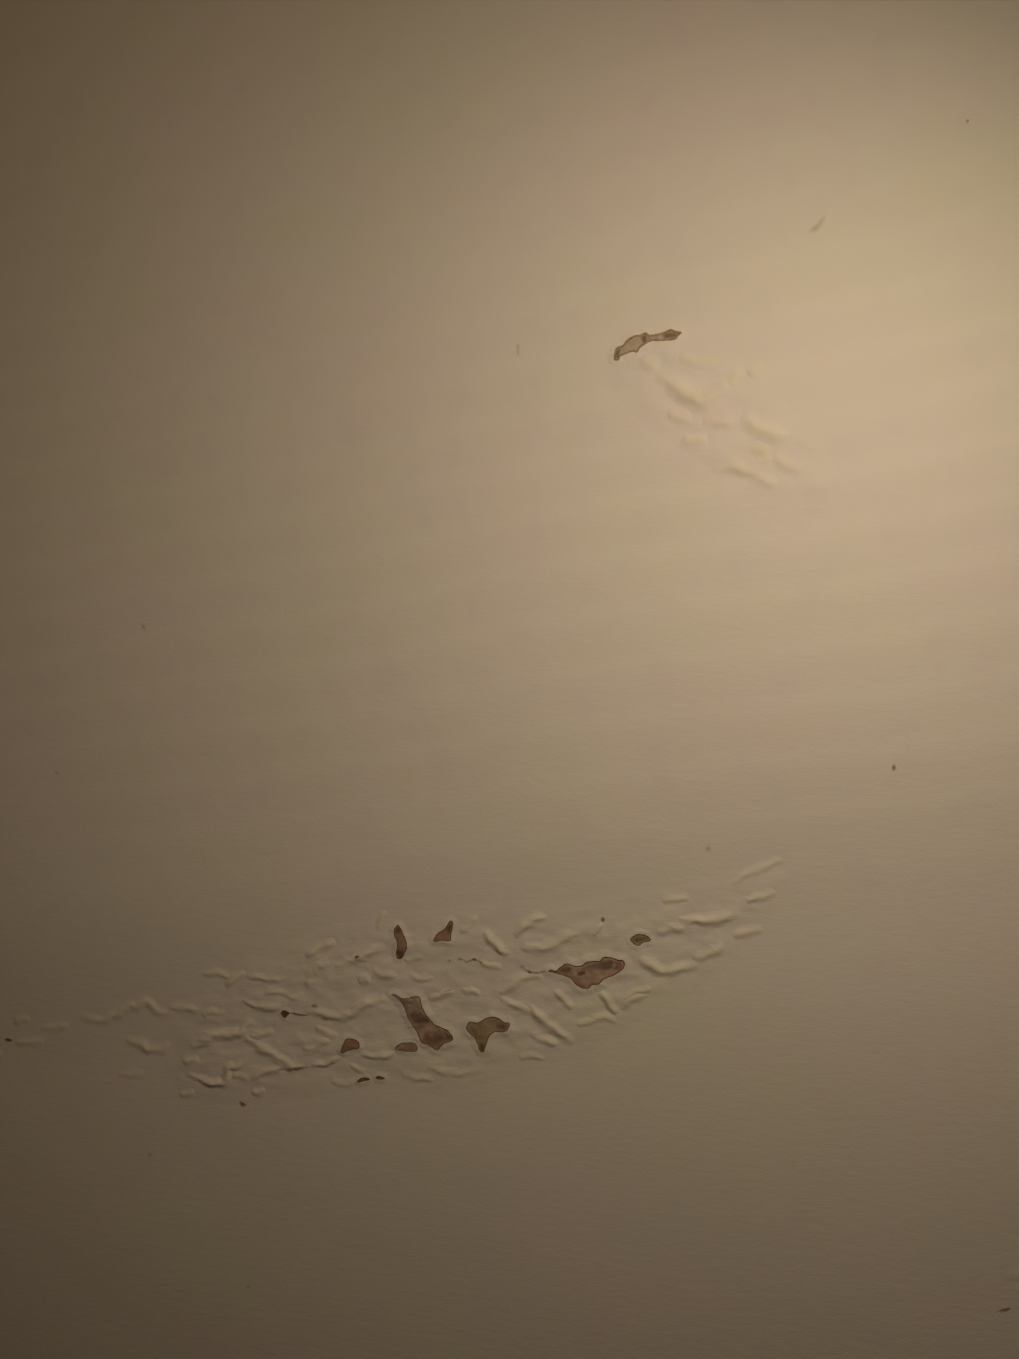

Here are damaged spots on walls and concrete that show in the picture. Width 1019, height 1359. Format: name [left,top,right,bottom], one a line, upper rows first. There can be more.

peeling [607,322,688,368]
peeling [388,915,459,966]
peeling [541,928,657,996]
peeling [384,986,517,1059]